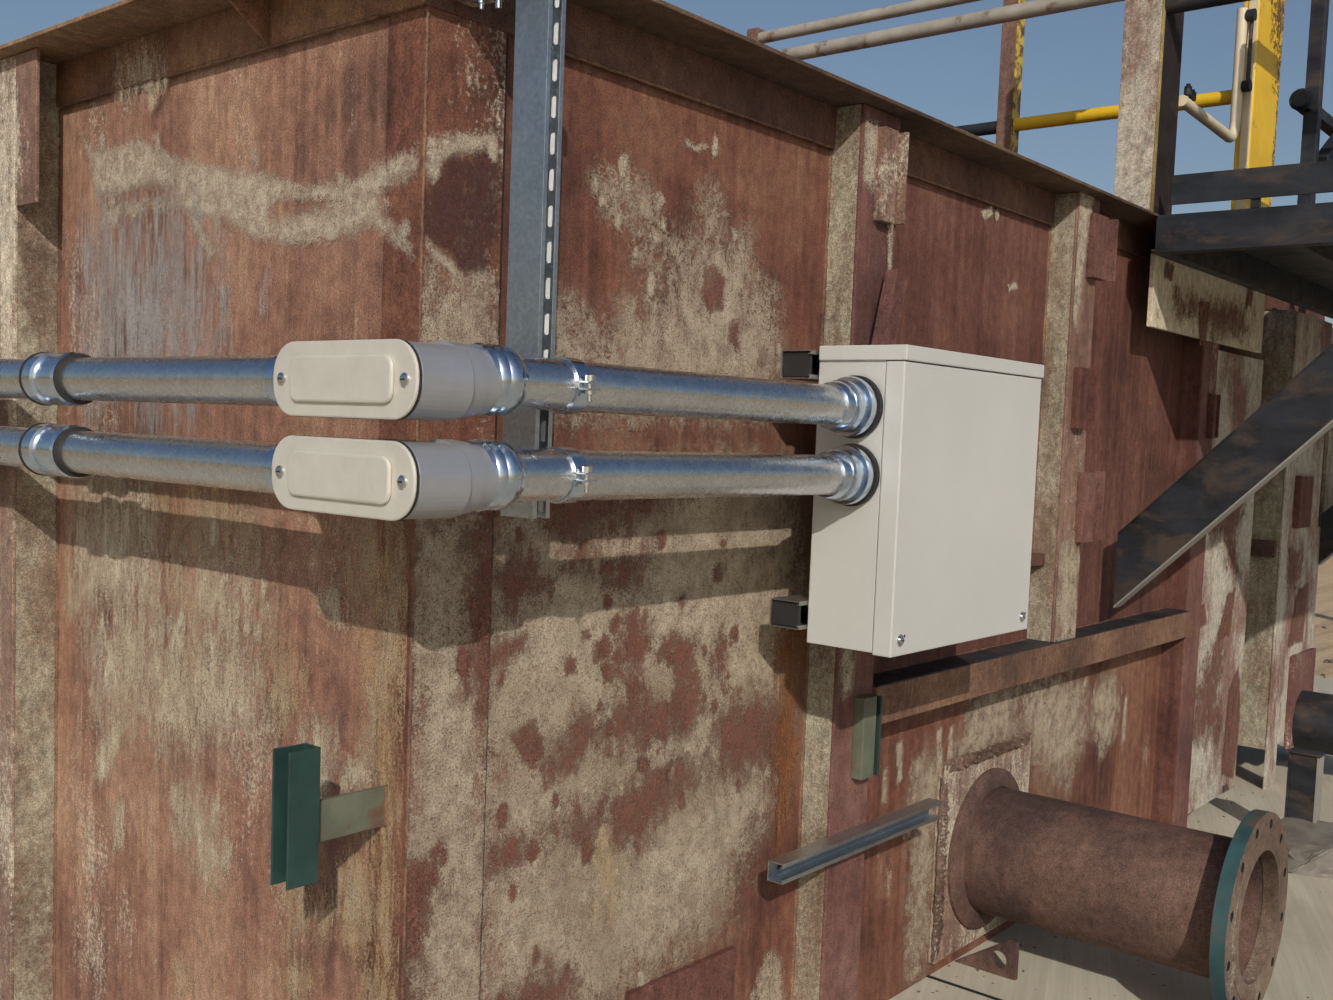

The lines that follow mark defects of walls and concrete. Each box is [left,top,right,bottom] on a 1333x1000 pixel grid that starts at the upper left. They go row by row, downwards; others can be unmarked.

peeling [428,161,441,185]
peeling [487,138,500,163]
peeling [862,119,881,195]
peeling [381,190,411,247]
peeling [555,154,786,380]
corrosion [1165,262,1254,348]
peeling [553,412,778,454]
corrosion [1193,503,1246,778]
corrosion [455,499,807,927]
corrosion [271,518,447,1000]
peeling [881,667,1128,982]
corrosion [496,947,583,1000]